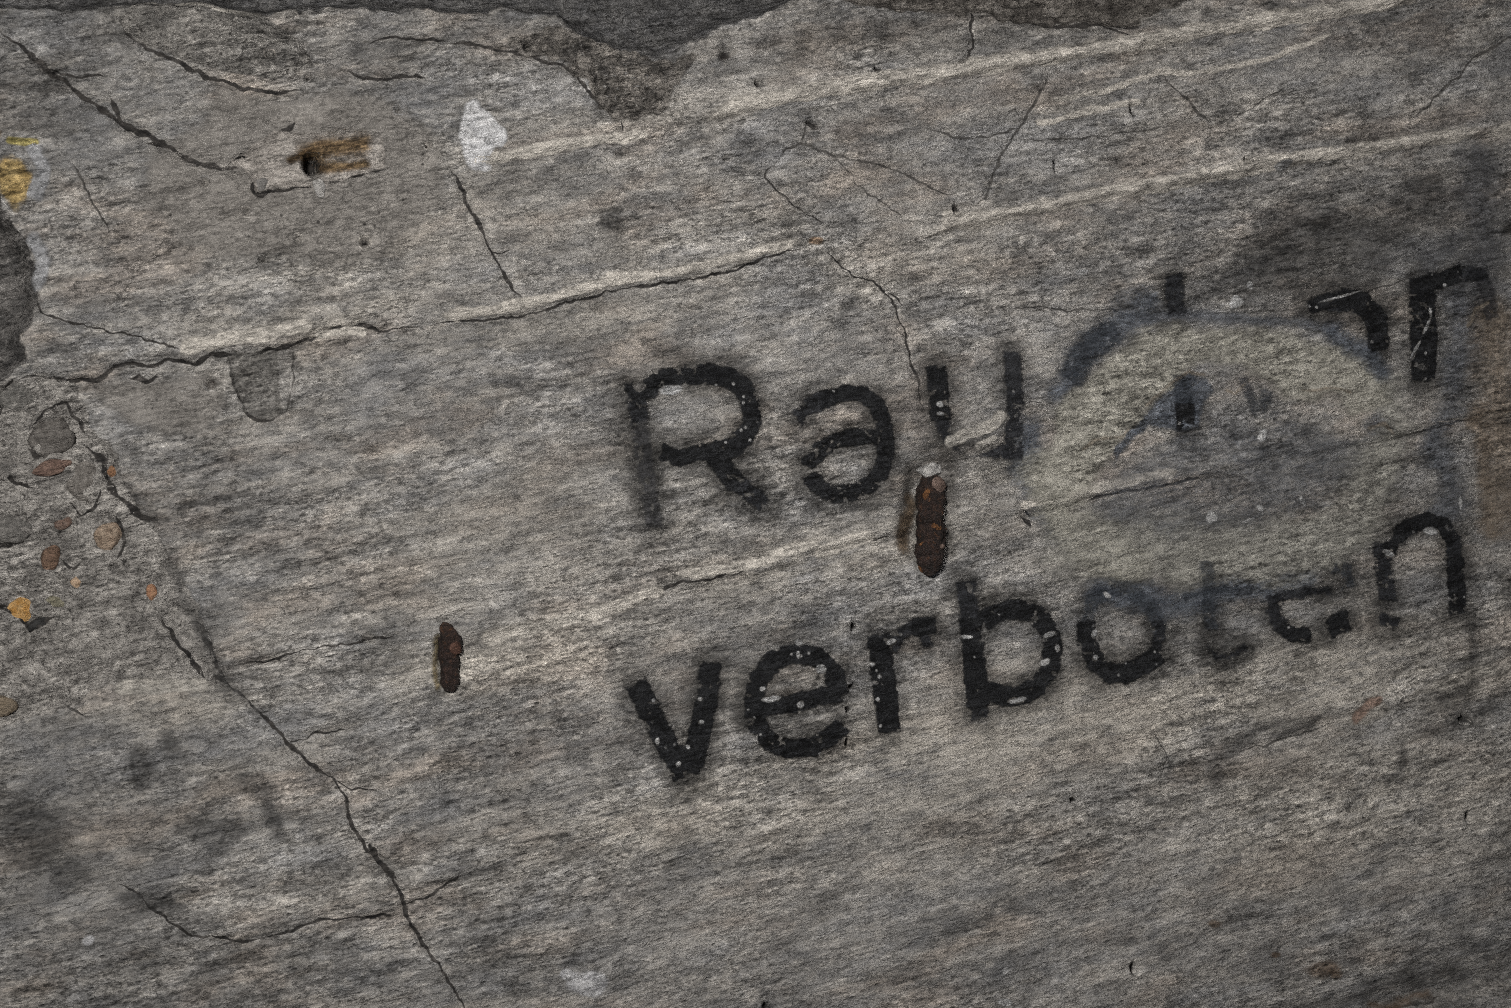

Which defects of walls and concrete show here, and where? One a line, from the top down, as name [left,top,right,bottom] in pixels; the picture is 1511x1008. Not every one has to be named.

crack [0,32,255,171]
crack [116,17,303,95]
crack [347,35,623,131]
crack [1017,21,1146,41]
rust [287,136,369,173]
crack [18,76,1285,410]
crack [1208,267,1430,315]
rust [897,476,946,552]
crack [119,623,465,1008]